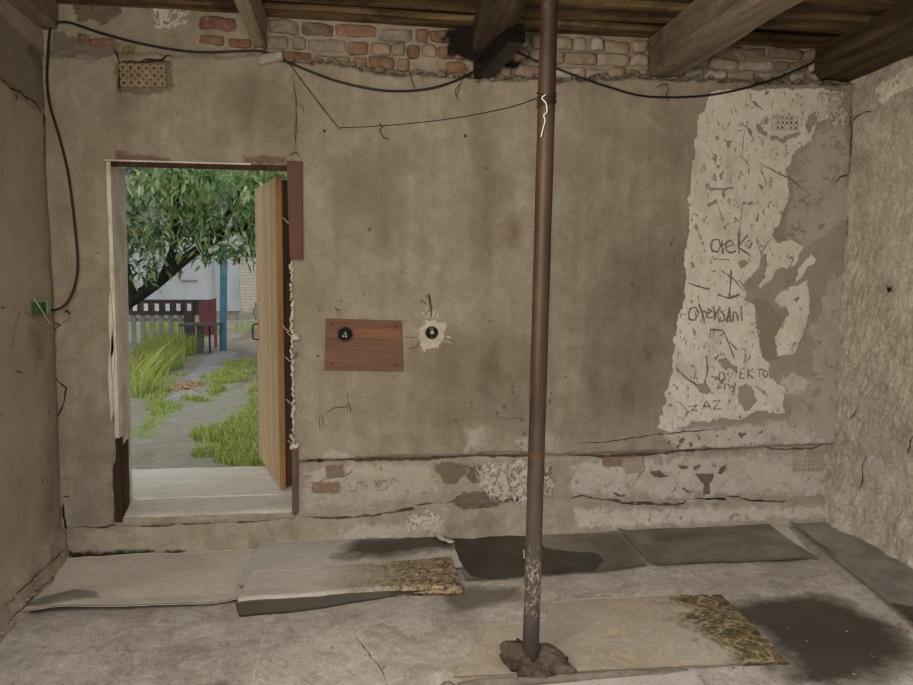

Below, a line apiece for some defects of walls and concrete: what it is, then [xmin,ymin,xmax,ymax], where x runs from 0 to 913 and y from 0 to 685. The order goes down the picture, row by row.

flaking render [266,19,540,83]
flaking render [556,36,651,83]
peeling [875,67,913,104]
peeling [657,45,863,452]
crack [569,427,822,458]
flaking render [303,465,362,493]
peeling [404,457,528,536]
peeling [543,460,557,499]
flaking render [602,456,668,486]
flaking render [678,465,726,495]
damp [736,596,907,683]